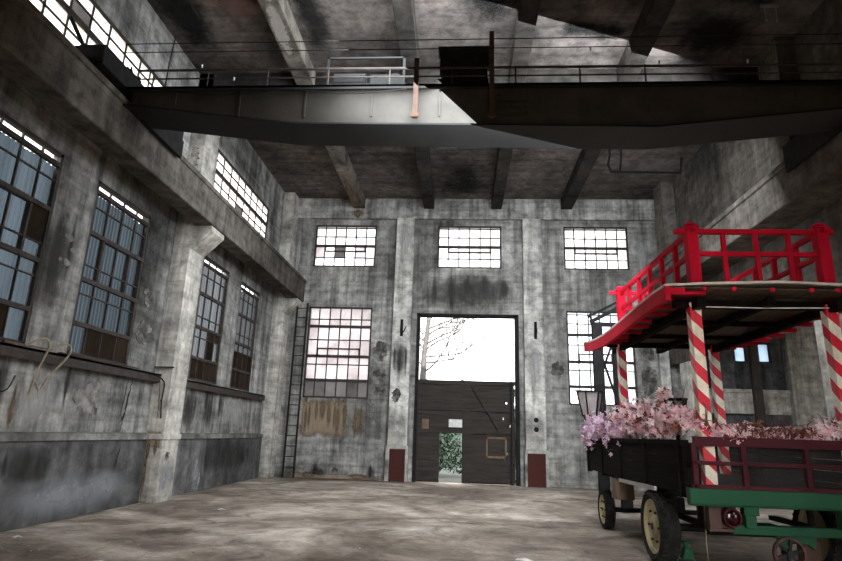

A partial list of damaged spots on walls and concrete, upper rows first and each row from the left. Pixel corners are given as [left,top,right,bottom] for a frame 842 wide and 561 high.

water stain [297,0,329,47]
water stain [467,0,505,18]
water stain [0,366,8,399]